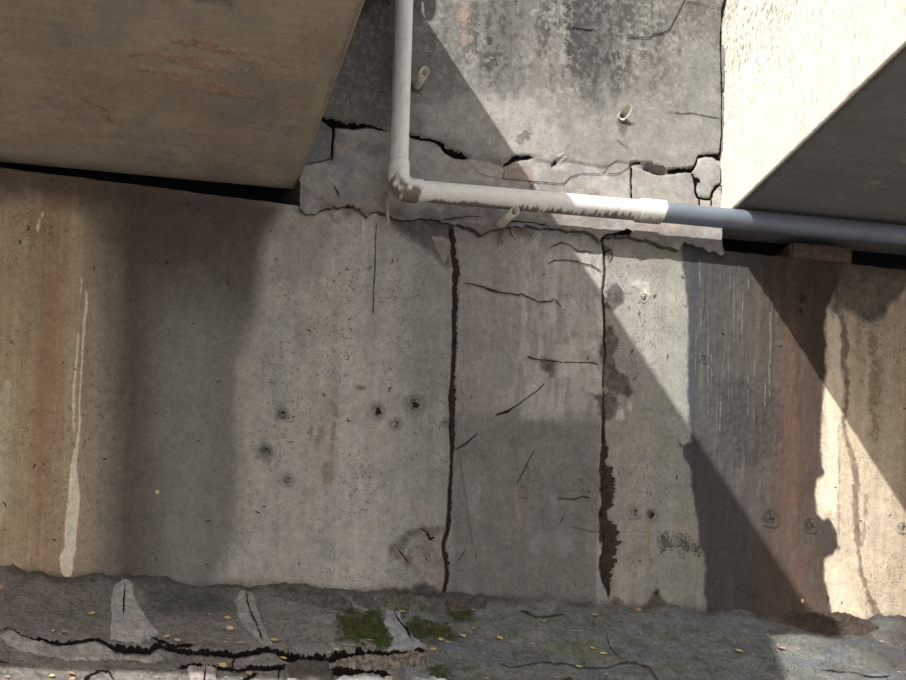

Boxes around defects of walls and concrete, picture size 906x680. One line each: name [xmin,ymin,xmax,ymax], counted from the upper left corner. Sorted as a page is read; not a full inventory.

crack [307,117,384,164]
crack [409,0,726,205]
peeling [638,159,669,176]
crack [0,592,426,680]
leakage [0,168,462,587]
spalling [386,522,449,588]
crack [398,216,632,597]
leakage [652,246,906,678]